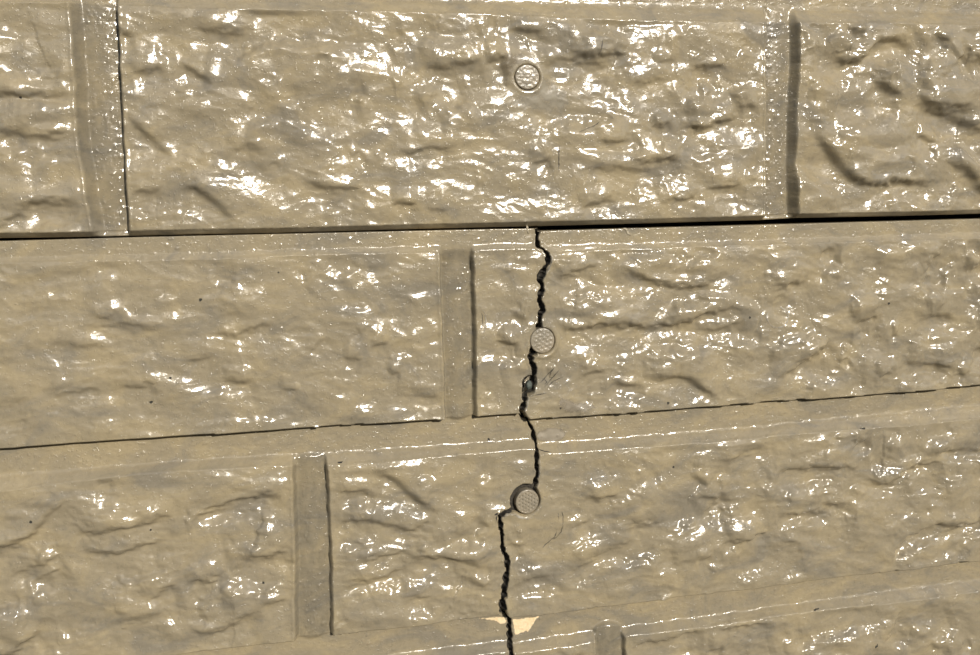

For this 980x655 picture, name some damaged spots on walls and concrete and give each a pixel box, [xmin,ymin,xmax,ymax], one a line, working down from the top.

crack [495,226,553,655]